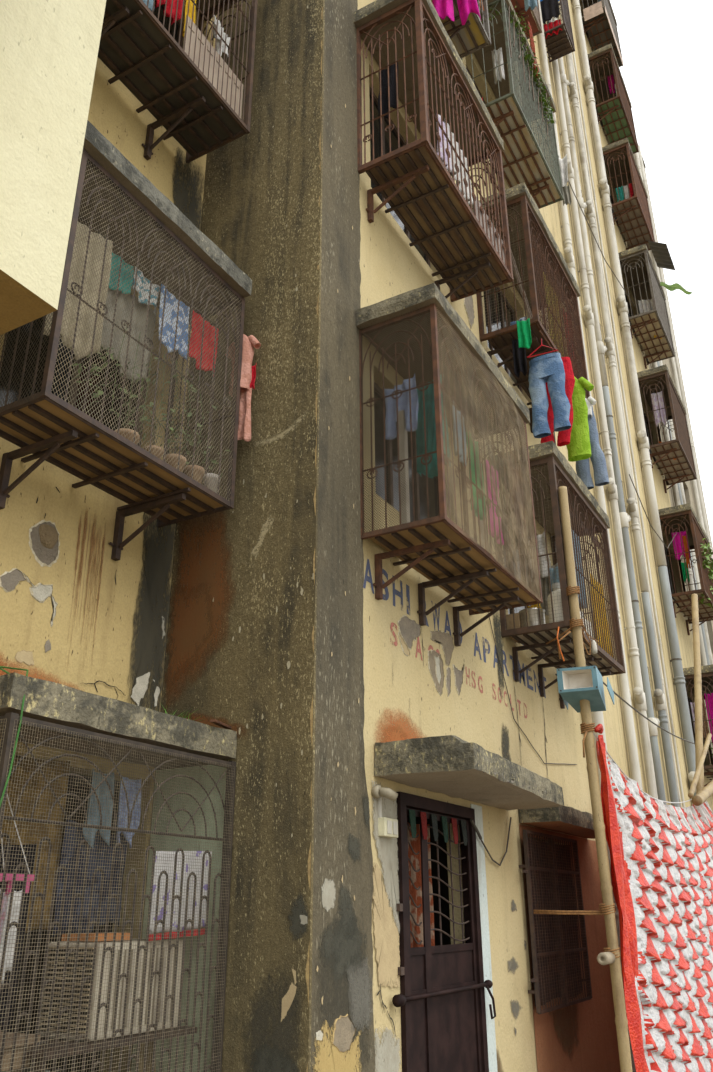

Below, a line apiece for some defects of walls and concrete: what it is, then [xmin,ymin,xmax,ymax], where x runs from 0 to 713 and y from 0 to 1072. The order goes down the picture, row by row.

spalling [29,520,60,567]
rust [76,520,104,593]
peeling [0,568,58,627]
rust [165,511,232,702]
spalling [131,672,160,707]
rust [376,713,422,743]
peeling [308,844,343,912]
peeling [281,940,323,1022]
peeling [306,1014,361,1072]
peeling [374,1027,401,1072]